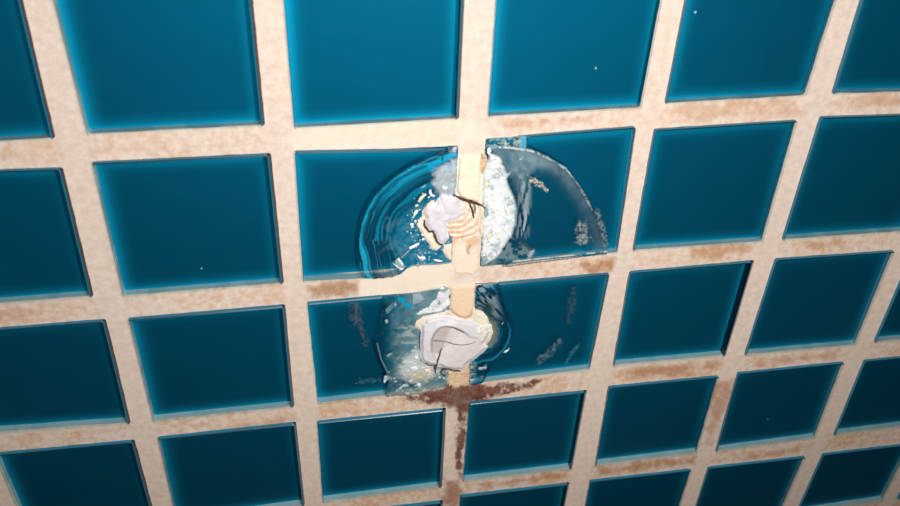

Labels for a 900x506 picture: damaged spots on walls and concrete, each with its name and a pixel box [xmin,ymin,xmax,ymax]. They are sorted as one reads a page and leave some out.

crack [419,326,476,377]
corrosion [407,380,541,470]